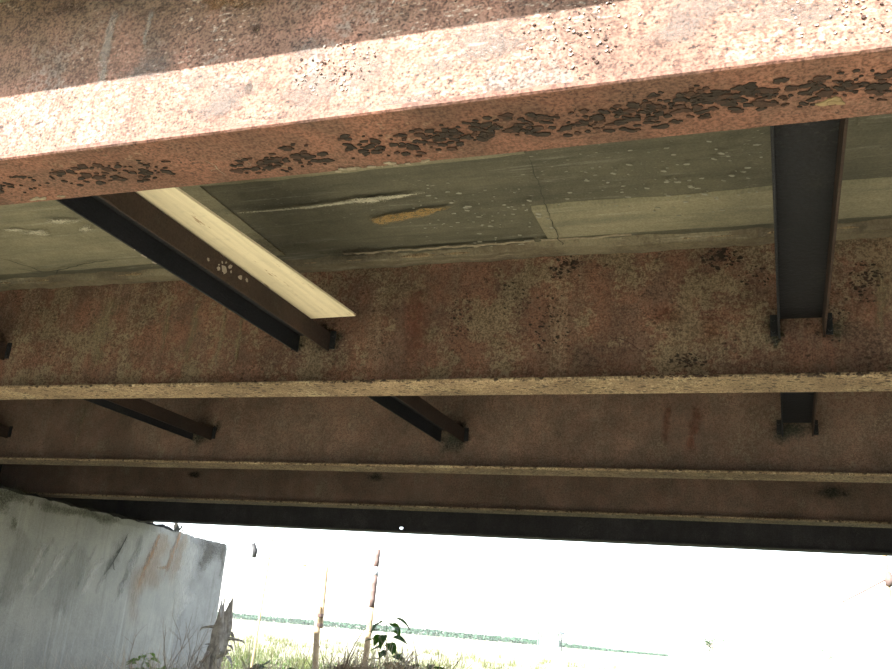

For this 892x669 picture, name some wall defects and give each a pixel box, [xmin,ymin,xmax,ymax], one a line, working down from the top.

damp [176,538,226,609]